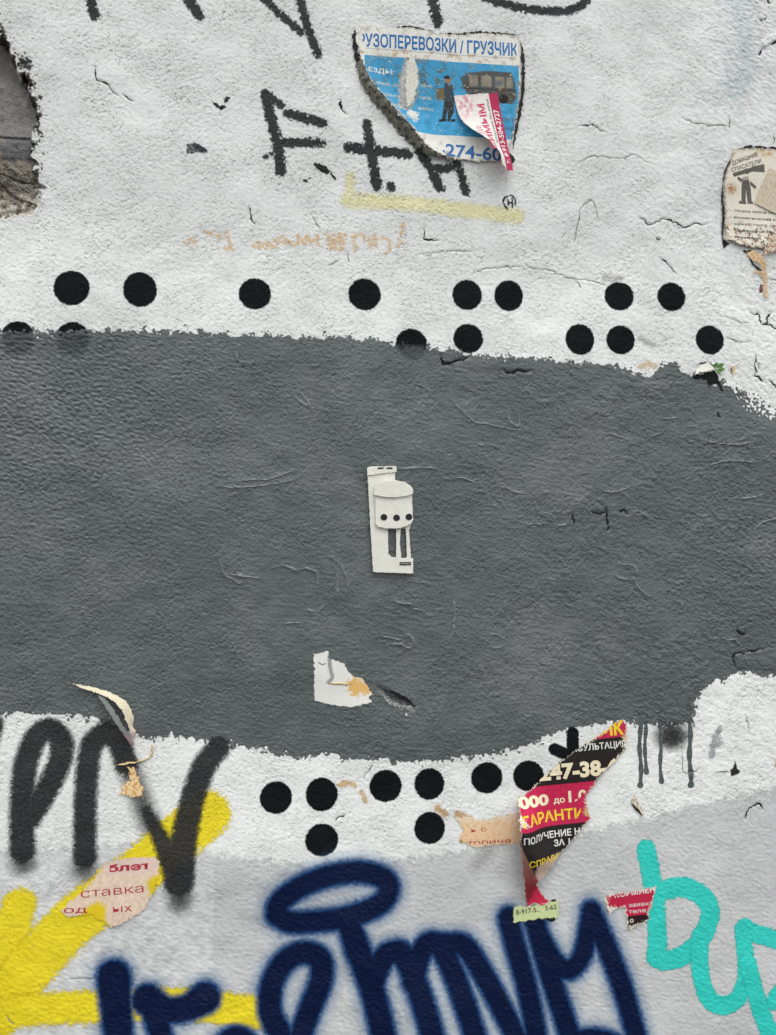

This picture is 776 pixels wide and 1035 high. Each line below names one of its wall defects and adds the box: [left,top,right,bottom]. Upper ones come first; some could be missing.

spalling [0,45,41,219]